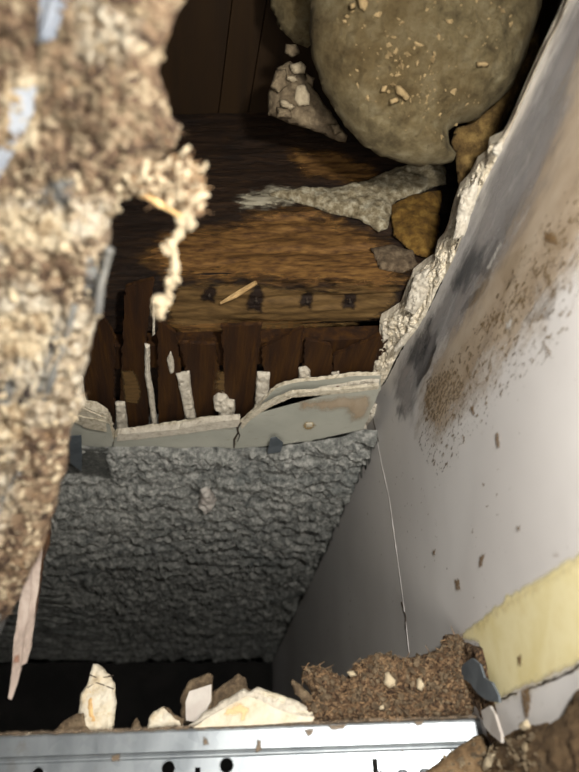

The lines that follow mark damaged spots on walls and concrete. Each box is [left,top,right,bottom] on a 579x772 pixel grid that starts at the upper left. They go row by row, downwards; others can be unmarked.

water stain [397,6,579,475]
flaking render [359,403,377,431]
spalling [66,447,110,478]
peeling [195,479,217,514]